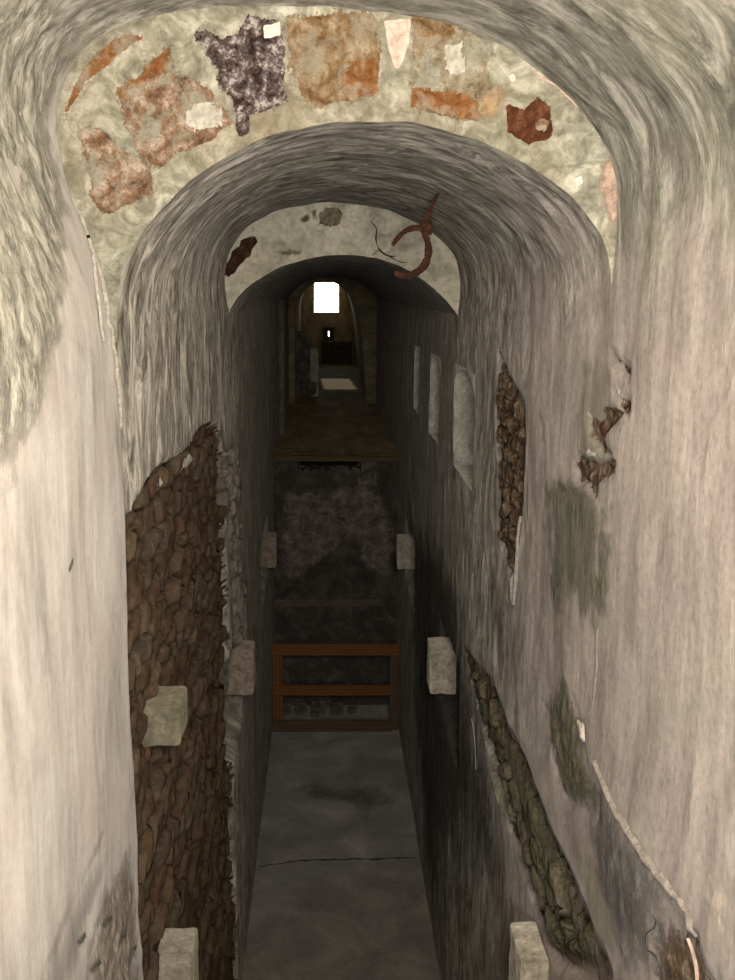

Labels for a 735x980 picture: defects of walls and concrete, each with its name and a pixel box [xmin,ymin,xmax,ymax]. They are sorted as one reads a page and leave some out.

spalling [63,34,143,117]
spalling [77,8,384,214]
corrosion [479,86,553,145]
peeling [0,0,123,456]
spalling [225,236,258,277]
spalling [318,207,343,227]
spalling [496,362,525,606]
spalling [558,385,631,497]
spalling [79,422,248,980]
spalling [645,917,710,980]